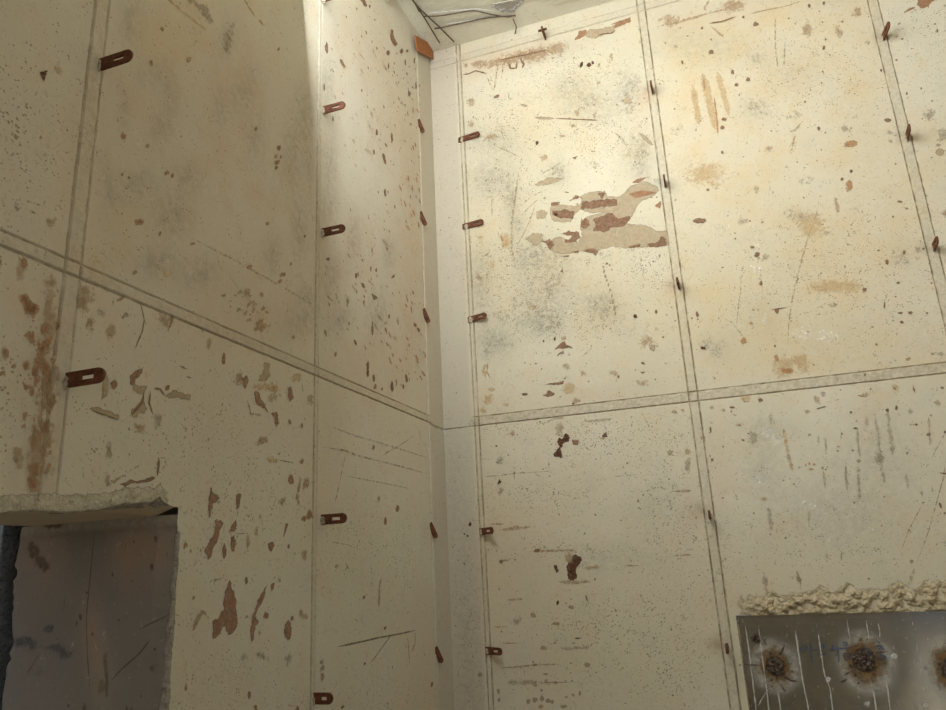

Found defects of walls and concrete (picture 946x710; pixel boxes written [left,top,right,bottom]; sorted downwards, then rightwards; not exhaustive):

peeling [904,0,935,13]
peeling [526,177,669,257]
rust [0,276,60,500]
peeling [130,369,191,432]
spalling [0,460,168,513]
peeling [201,488,250,559]
spalling [150,532,180,710]
peeling [193,580,274,641]
spalling [738,574,946,616]